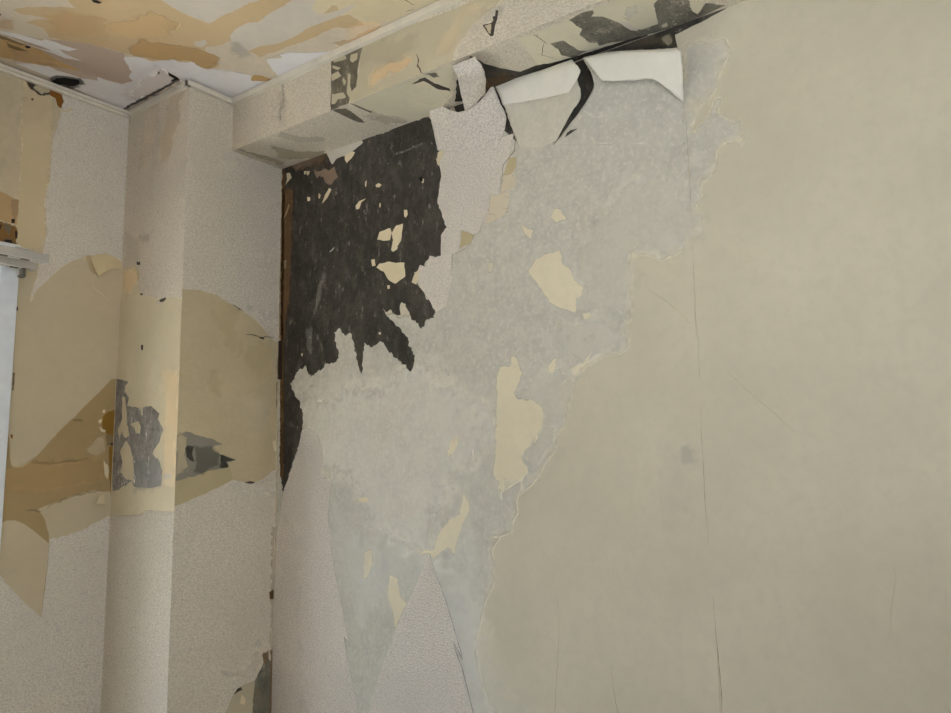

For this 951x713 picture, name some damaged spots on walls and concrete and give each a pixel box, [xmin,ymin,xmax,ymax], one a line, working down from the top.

peeling [330,48,372,123]
peeling [449,79,465,112]
peeling [469,8,726,143]
peeling [460,230,474,248]
peeling [279,116,447,491]
flaking render [112,379,236,491]
peeling [226,646,273,713]